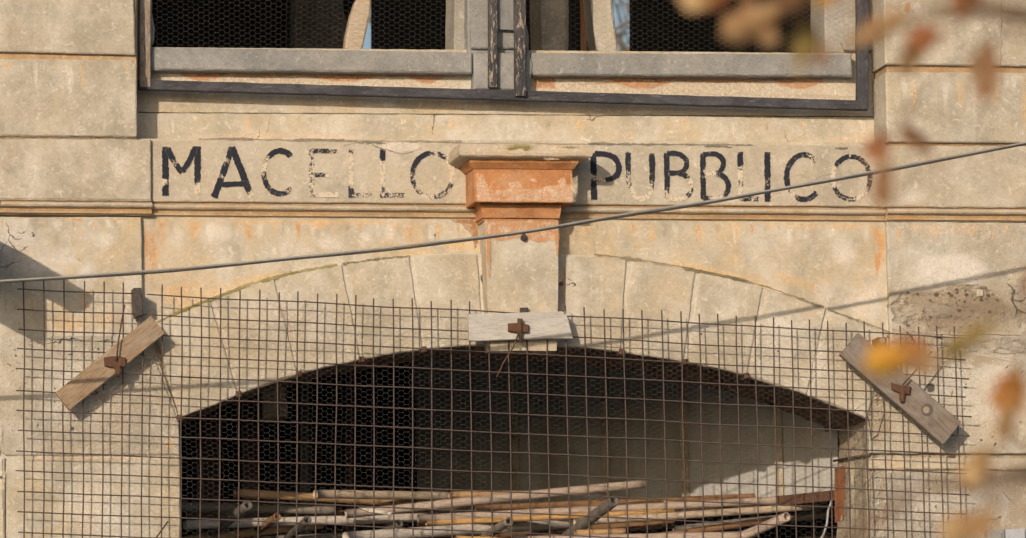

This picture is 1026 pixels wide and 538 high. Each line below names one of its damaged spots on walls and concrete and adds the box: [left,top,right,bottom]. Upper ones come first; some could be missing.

crack [0,222,35,268]
peeling [888,277,1026,405]